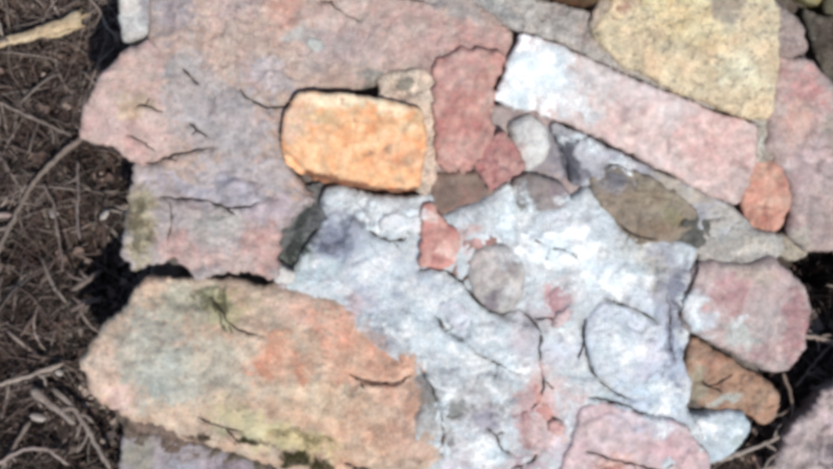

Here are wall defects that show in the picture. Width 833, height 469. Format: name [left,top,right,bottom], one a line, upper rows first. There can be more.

crack [126,123,215,165]